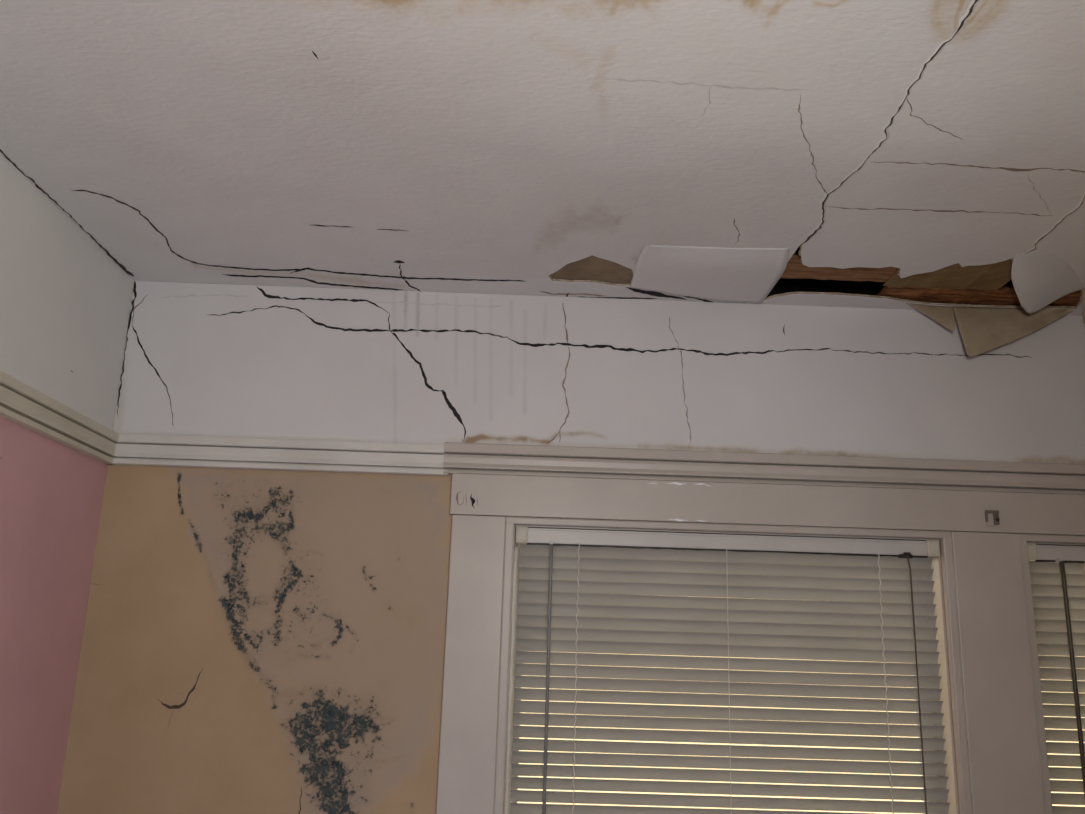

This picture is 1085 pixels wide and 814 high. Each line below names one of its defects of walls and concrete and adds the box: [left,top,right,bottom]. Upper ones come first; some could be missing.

damp [252,0,677,125]
damp [715,0,851,33]
damp [920,0,1015,49]
crack [602,0,1085,254]
crack [0,149,1033,444]
flaking render [549,255,633,286]
flaking render [765,240,1085,357]
damp [165,467,452,814]
crack [157,669,203,730]